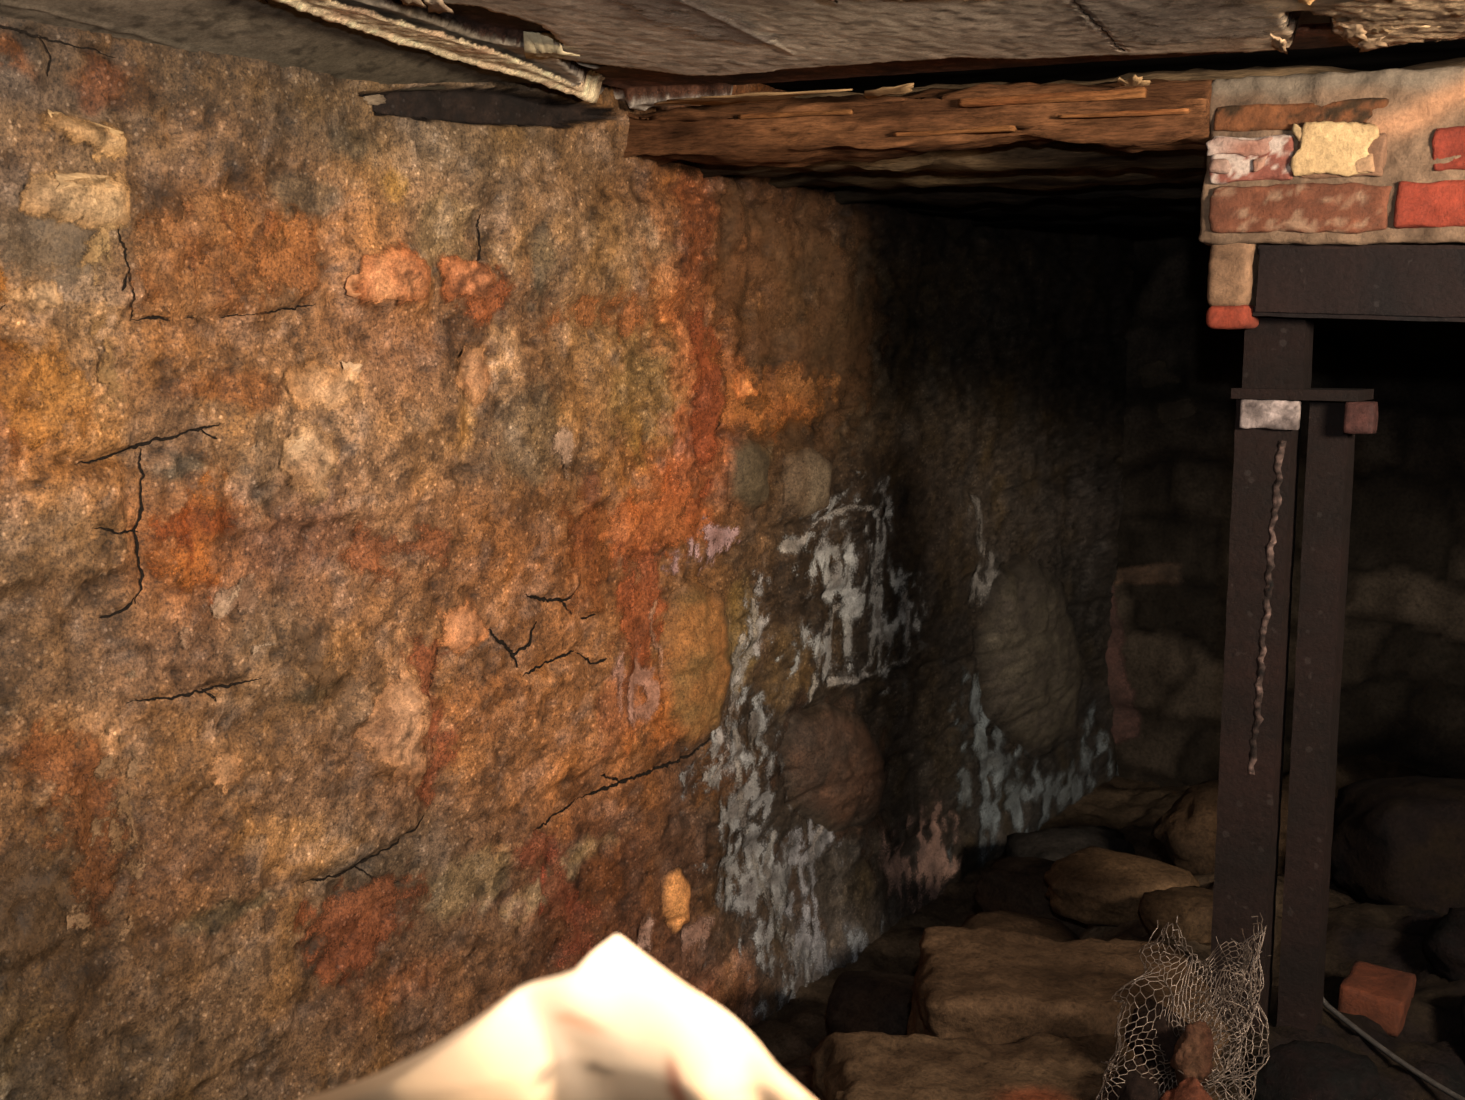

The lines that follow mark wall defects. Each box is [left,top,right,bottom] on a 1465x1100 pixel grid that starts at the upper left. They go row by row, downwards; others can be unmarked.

spalling [273,0,1465,129]
corrosion [0,328,97,465]
crack [77,423,221,618]
corrosion [539,280,841,693]
crack [128,678,262,703]
crack [488,589,607,676]
crack [533,733,716,831]
damp [678,472,1119,1021]
corrosion [294,873,431,988]
damp [634,914,656,957]